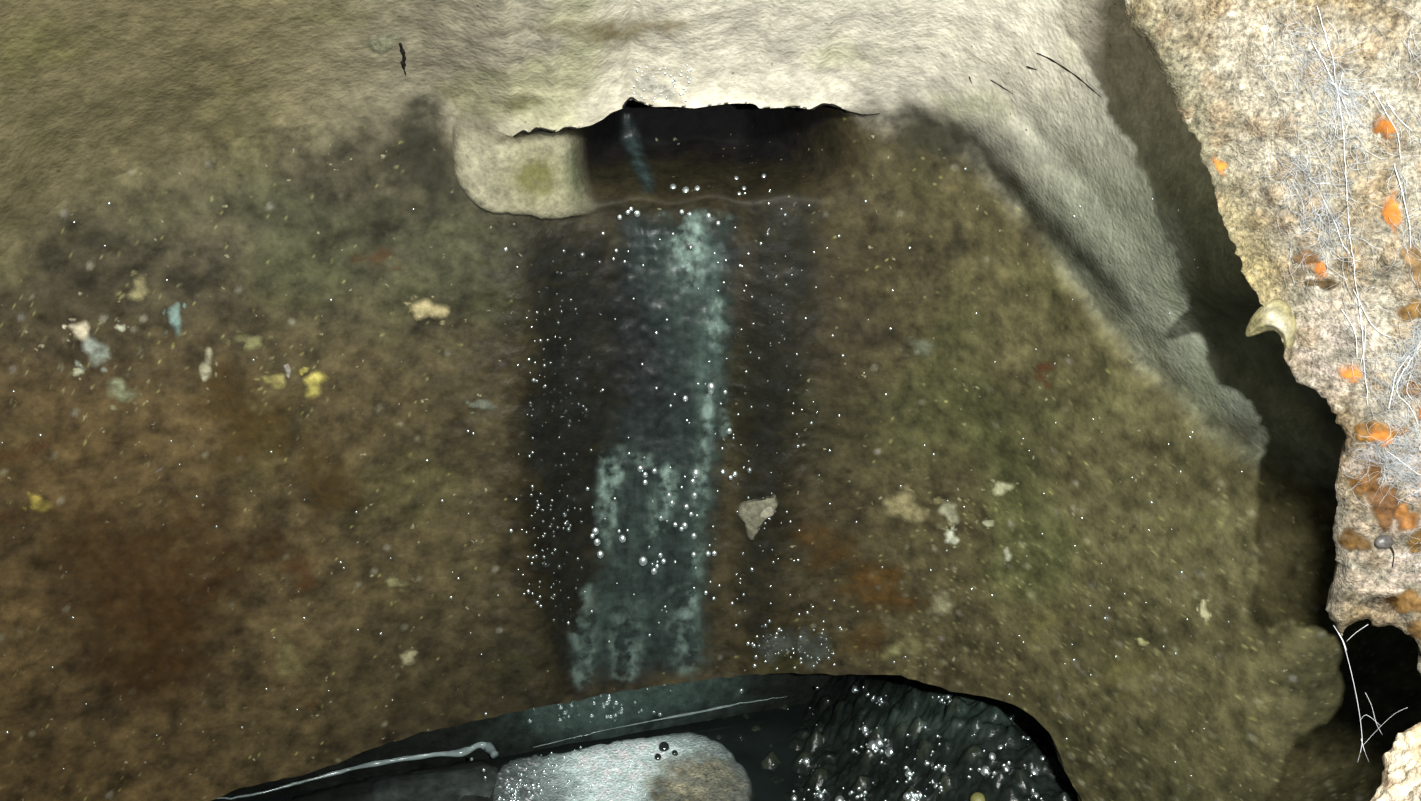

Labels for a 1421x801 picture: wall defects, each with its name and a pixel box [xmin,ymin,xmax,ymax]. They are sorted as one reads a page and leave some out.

water stain [527,241,618,653]